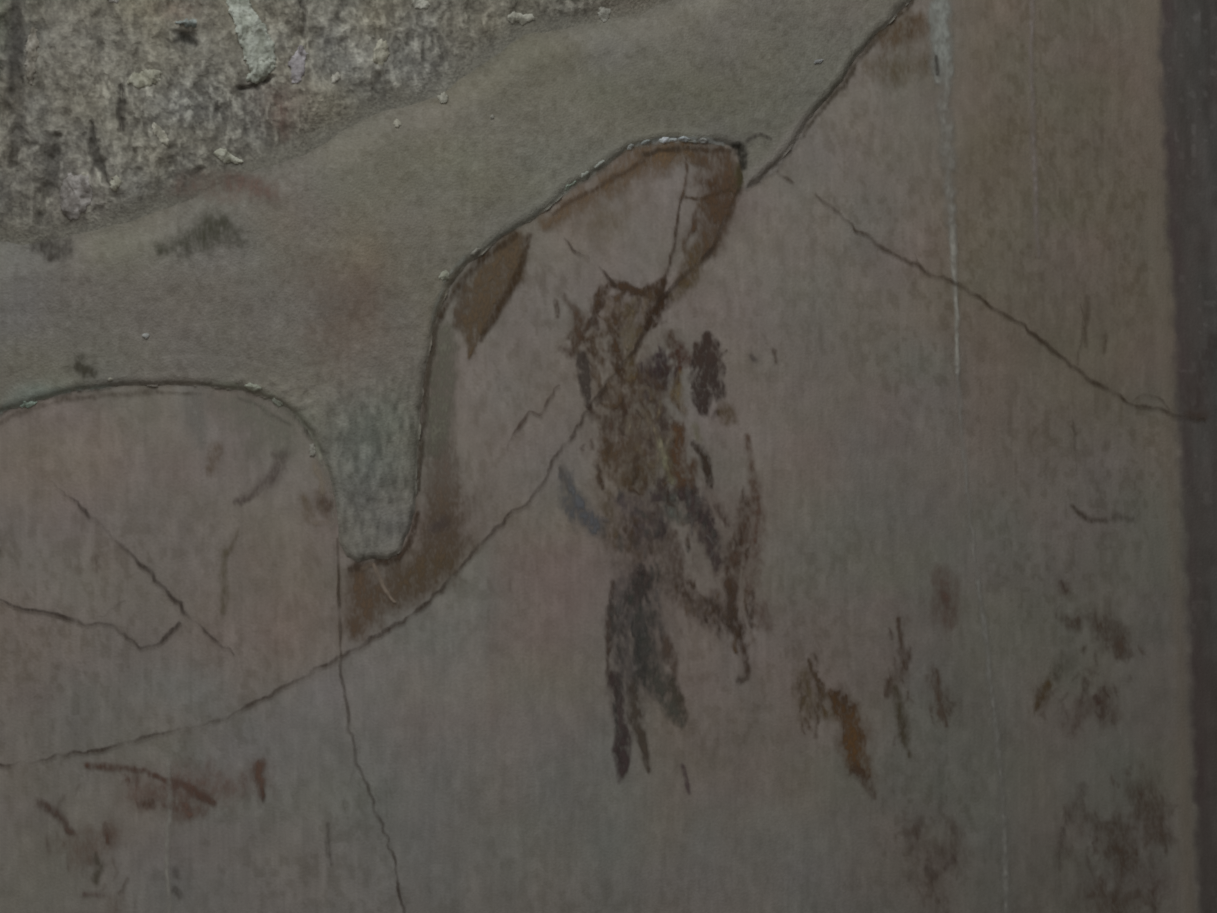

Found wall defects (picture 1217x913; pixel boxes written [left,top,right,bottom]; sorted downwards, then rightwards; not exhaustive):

flaking render [0,0,672,245]
peeling [627,136,690,150]
crack [1025,325,1062,357]
crack [5,602,96,624]
crack [136,559,215,649]
crack [321,504,527,667]
crack [73,746,111,754]
corrosion [798,659,870,779]